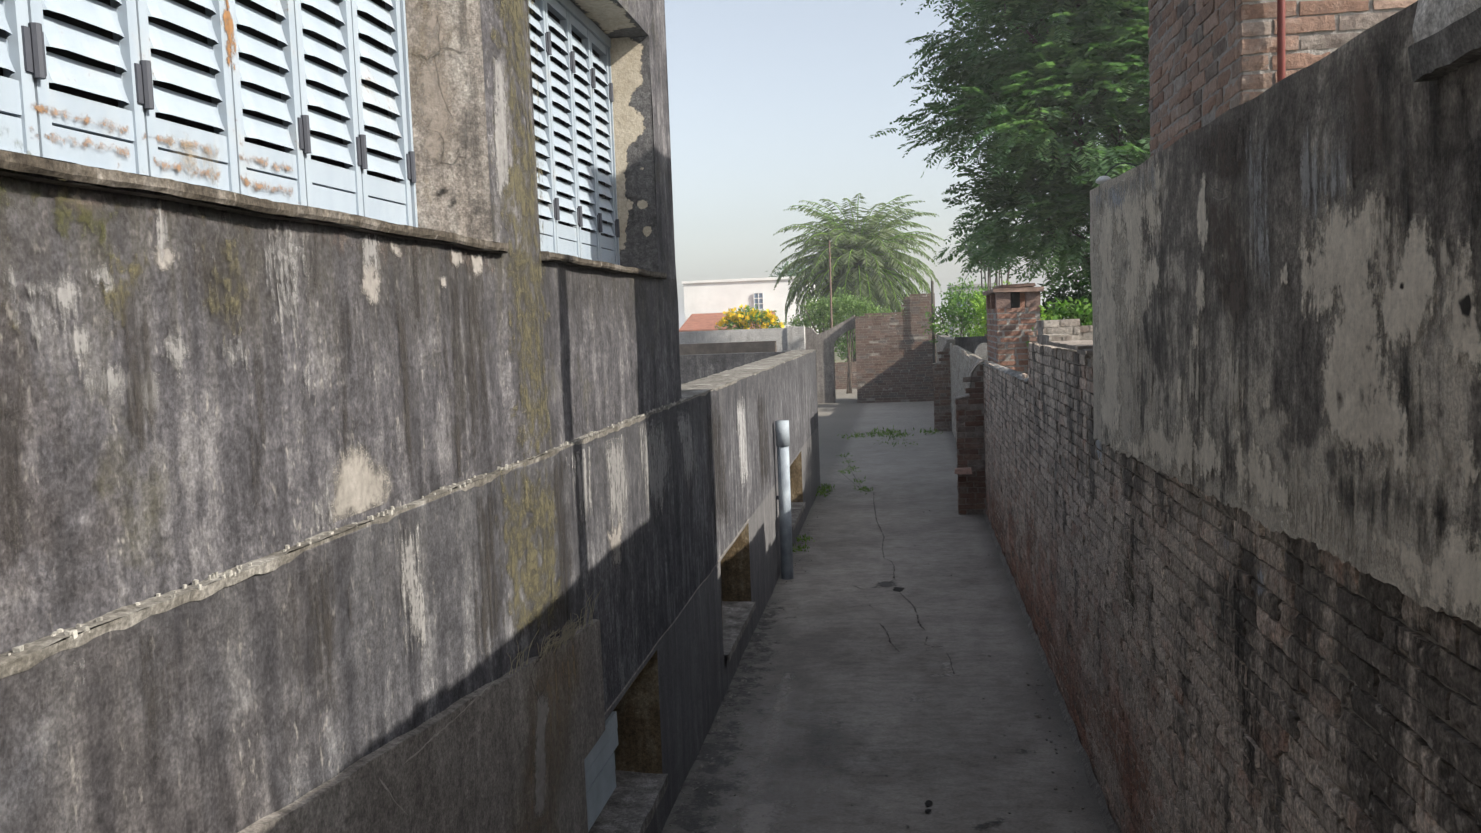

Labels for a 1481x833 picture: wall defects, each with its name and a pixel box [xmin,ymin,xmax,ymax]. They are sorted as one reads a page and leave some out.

corrosion [223,0,236,70]
corrosion [34,104,220,178]
corrosion [240,156,293,193]
peeling [574,0,652,255]
water stain [1249,147,1270,280]
water stain [1300,45,1408,231]
water stain [1399,348,1423,453]
flaking render [315,448,390,531]
water stain [1339,462,1444,542]
crack [843,458,954,674]
water stain [1207,534,1266,802]